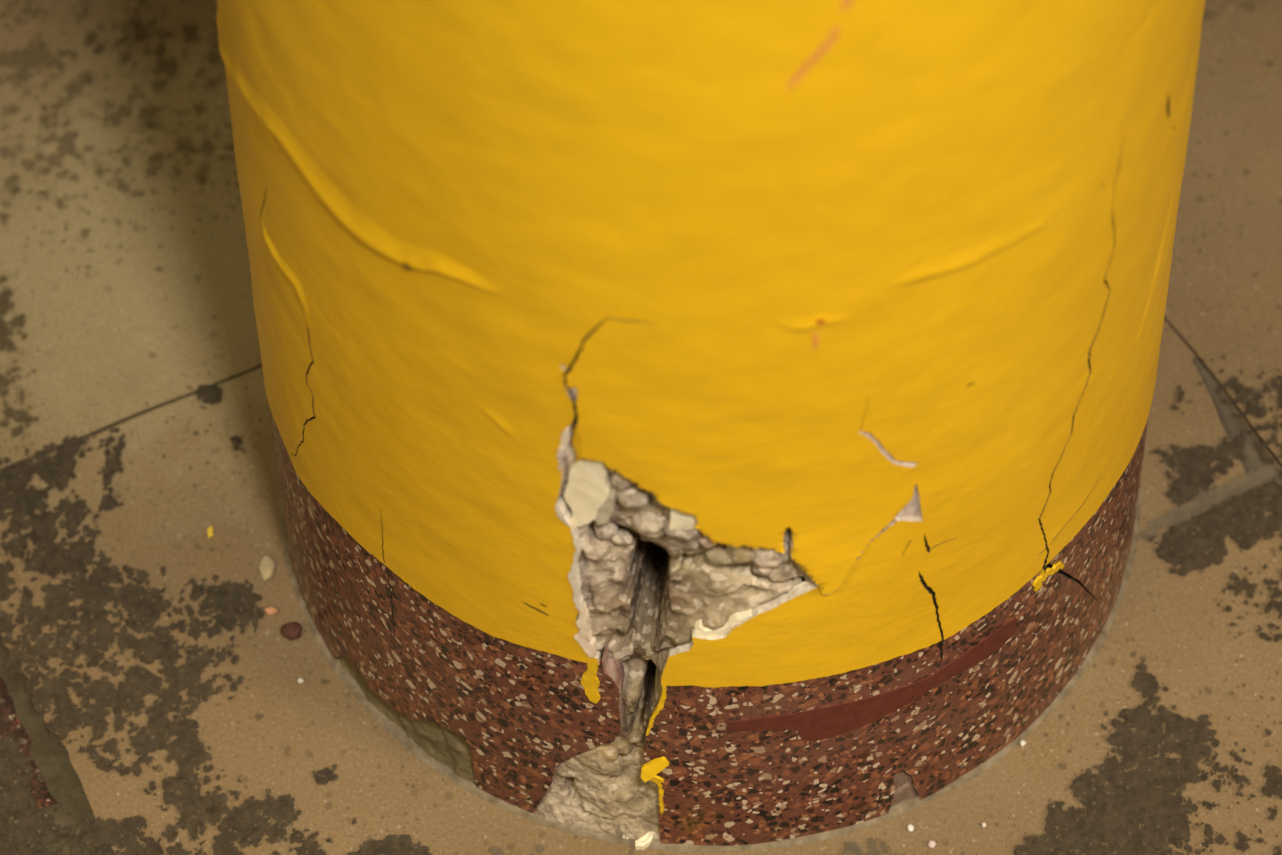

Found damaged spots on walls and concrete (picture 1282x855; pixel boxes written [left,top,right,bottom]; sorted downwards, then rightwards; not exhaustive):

crack [292,327,316,456]
crack [561,316,654,430]
crack [1037,136,1124,600]
spalling [537,425,920,850]
crack [902,534,956,667]